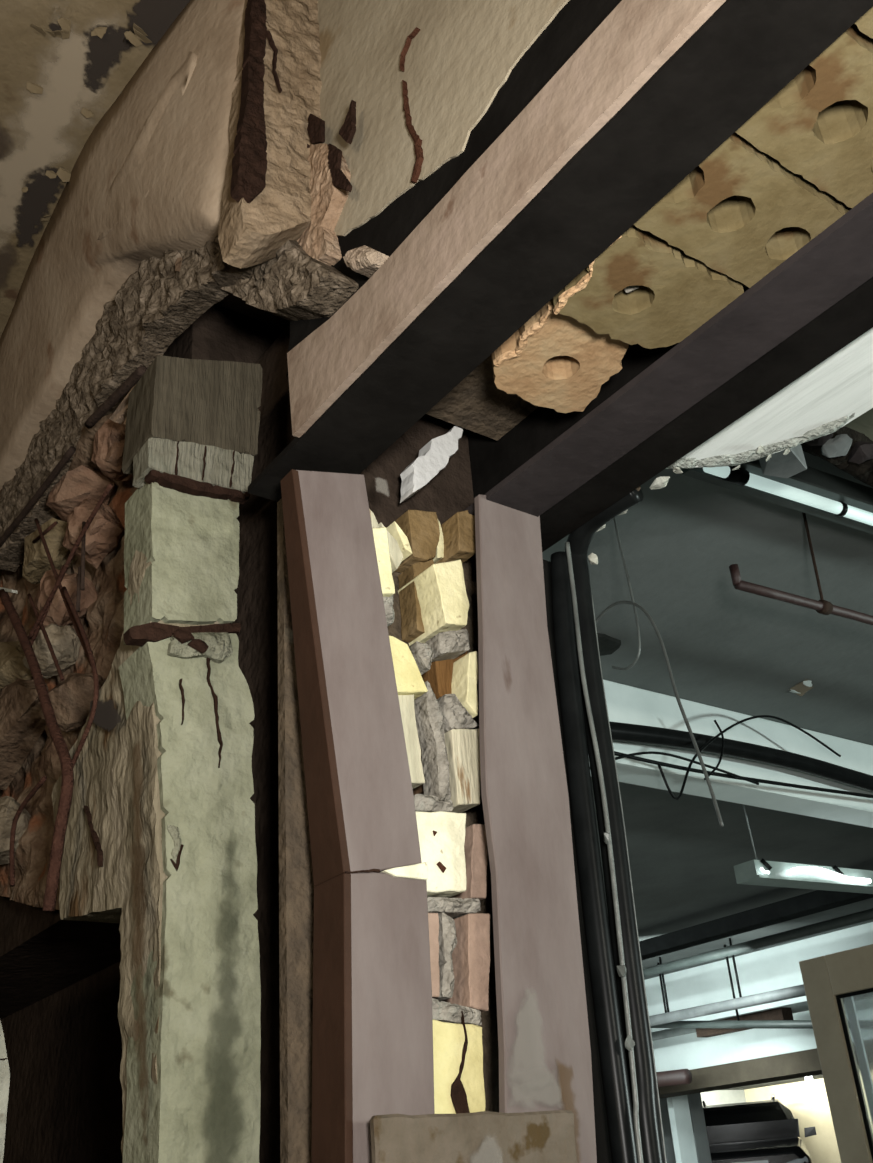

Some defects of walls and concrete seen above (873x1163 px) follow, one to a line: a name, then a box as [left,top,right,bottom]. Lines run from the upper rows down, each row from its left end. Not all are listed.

crack [400,27,424,184]
spalling [297,100,356,266]
spalling [667,413,873,488]
spalling [0,236,262,911]
crack [123,622,241,768]
crack [345,867,380,875]
crack [450,1011,470,1114]